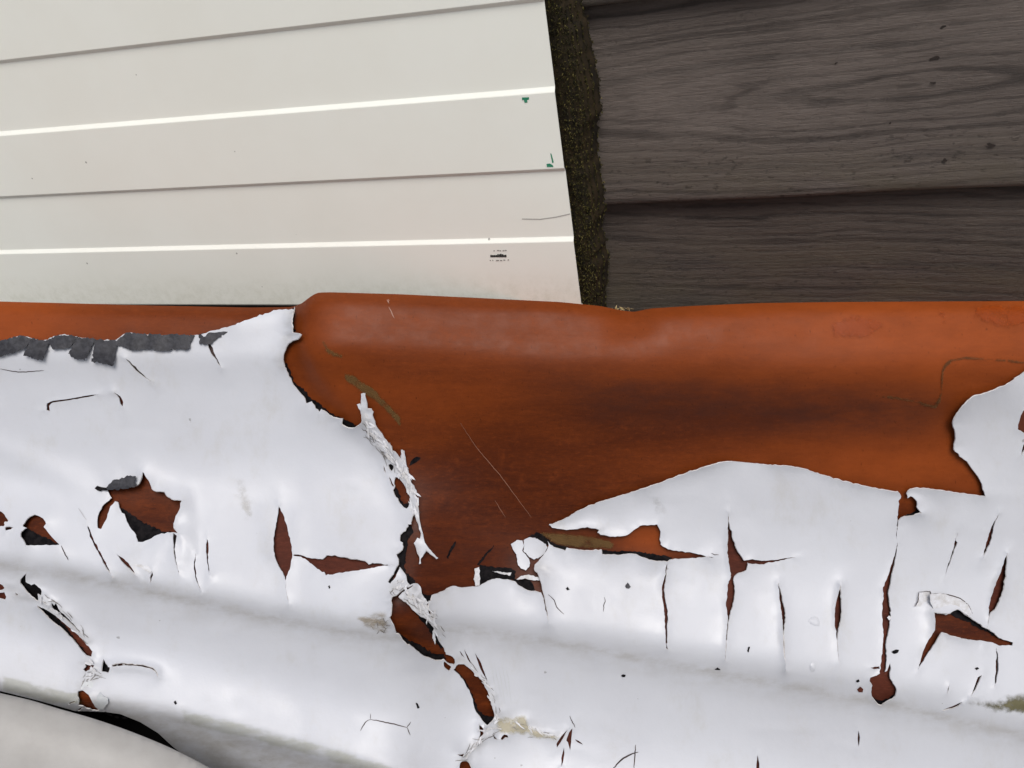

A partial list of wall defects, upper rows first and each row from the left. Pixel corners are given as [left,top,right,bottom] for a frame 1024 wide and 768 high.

peeling [0,292,1024,643]
crack [661,566,669,649]
crack [711,522,792,643]
crack [834,590,842,638]
crack [870,521,1012,710]